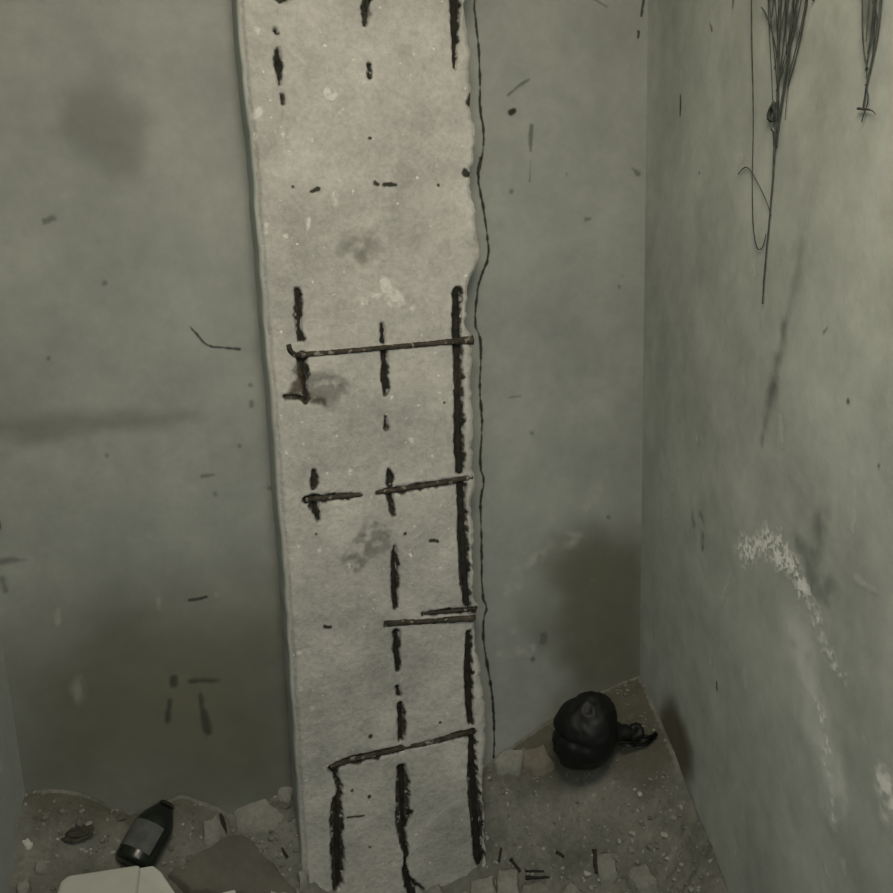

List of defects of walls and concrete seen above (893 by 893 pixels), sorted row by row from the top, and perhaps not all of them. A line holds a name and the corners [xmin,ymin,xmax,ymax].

spalling [360,0,371,27]
spalling [273,47,283,81]
spalling [283,287,310,405]
rust [289,365,325,404]
spalling [380,341,390,396]
spalling [421,286,478,616]
spalling [302,469,356,521]
spalling [375,469,423,516]
spalling [390,549,400,610]
water stain [738,526,846,823]
spalling [328,748,398,891]
spalling [395,765,424,893]